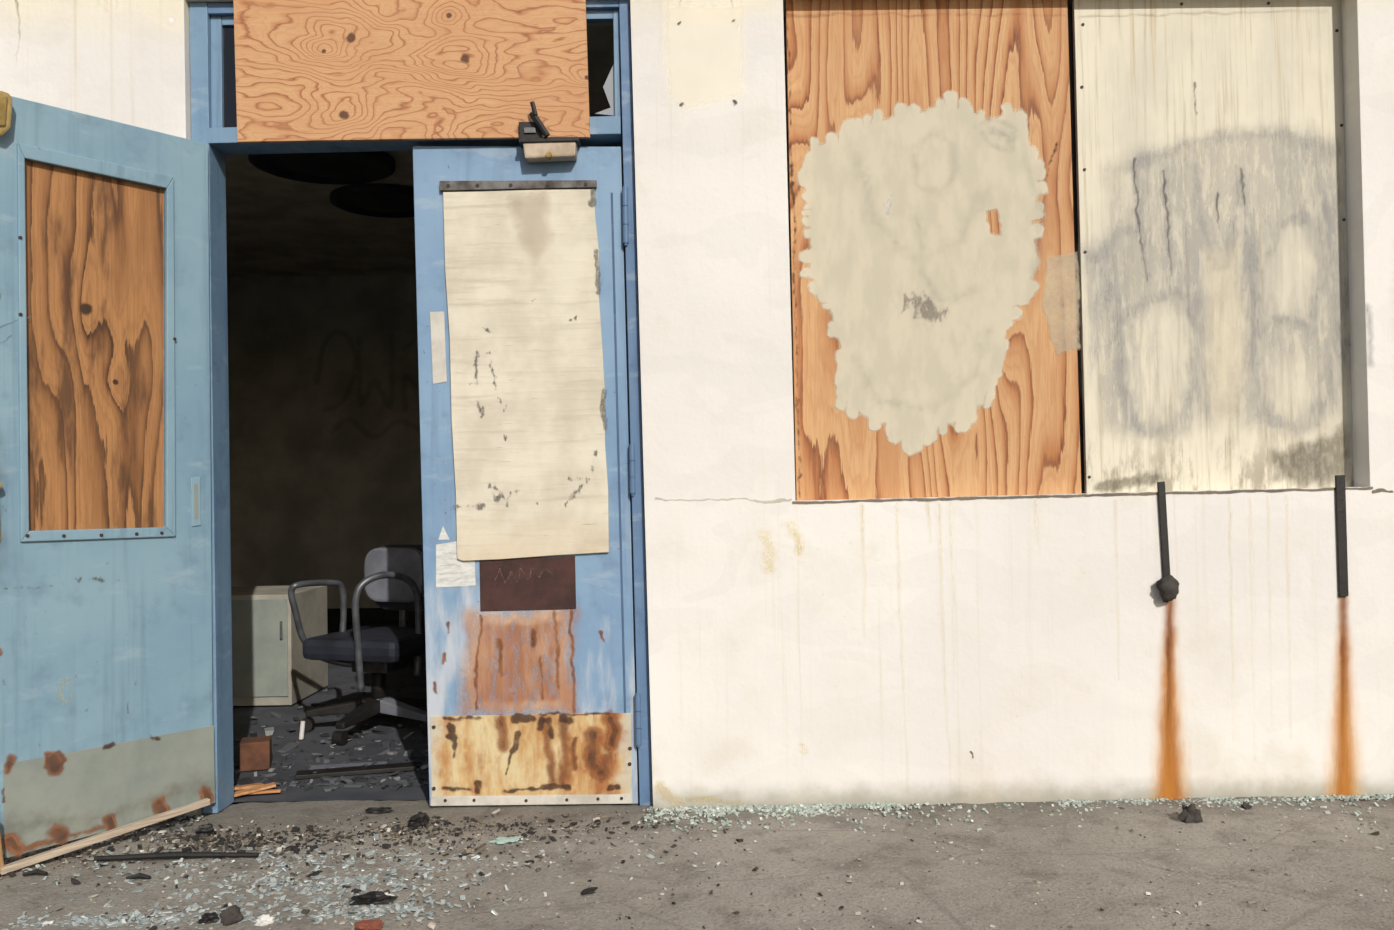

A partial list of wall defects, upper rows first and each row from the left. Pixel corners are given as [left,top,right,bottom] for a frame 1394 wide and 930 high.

corrosion [442,610,621,794]
corrosion [1161,601,1181,799]
corrosion [1333,597,1354,796]
corrosion [2,755,16,802]
corrosion [44,750,66,775]
corrosion [153,797,169,821]
corrosion [200,787,213,804]
corrosion [3,814,116,855]